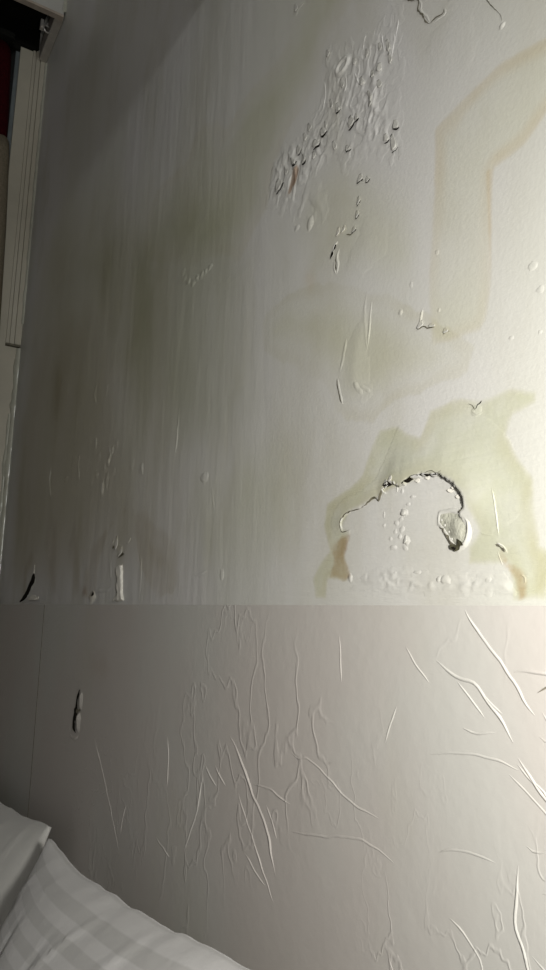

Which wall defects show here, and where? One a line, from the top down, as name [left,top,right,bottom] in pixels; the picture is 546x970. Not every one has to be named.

peeling [265,0,408,225]
spalling [437,507,472,553]